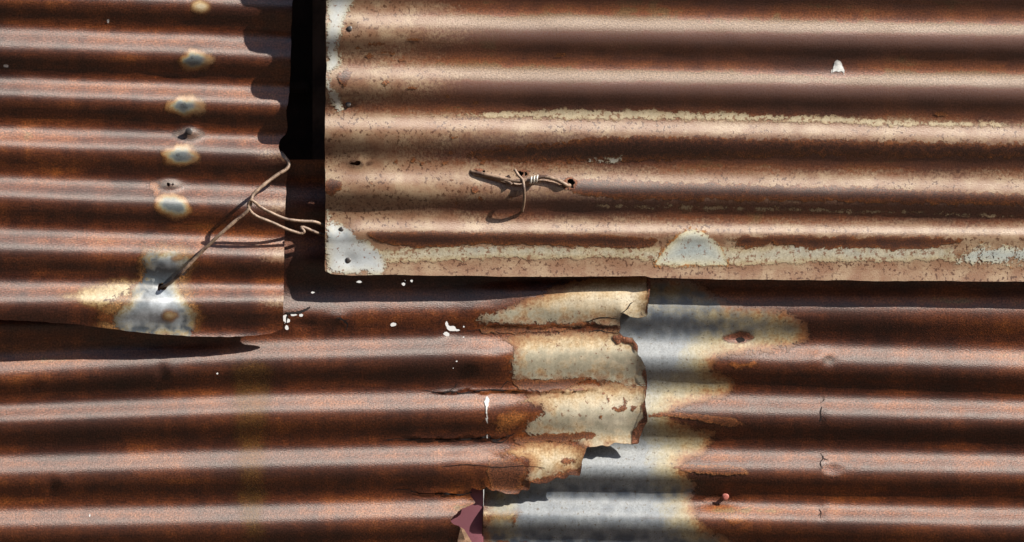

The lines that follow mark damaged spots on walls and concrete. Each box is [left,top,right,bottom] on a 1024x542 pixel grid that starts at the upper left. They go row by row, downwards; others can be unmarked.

rust [441,134,1024,165]
rust [558,178,1024,207]
peeling [325,210,387,275]
rust [367,230,658,249]
rust [725,234,963,253]
peeling [956,241,1024,269]
rust [88,241,210,334]
peeling [112,247,200,336]
peeling [476,226,811,542]
rust [649,412,743,427]
rust [674,463,748,476]
rust [715,511,751,526]